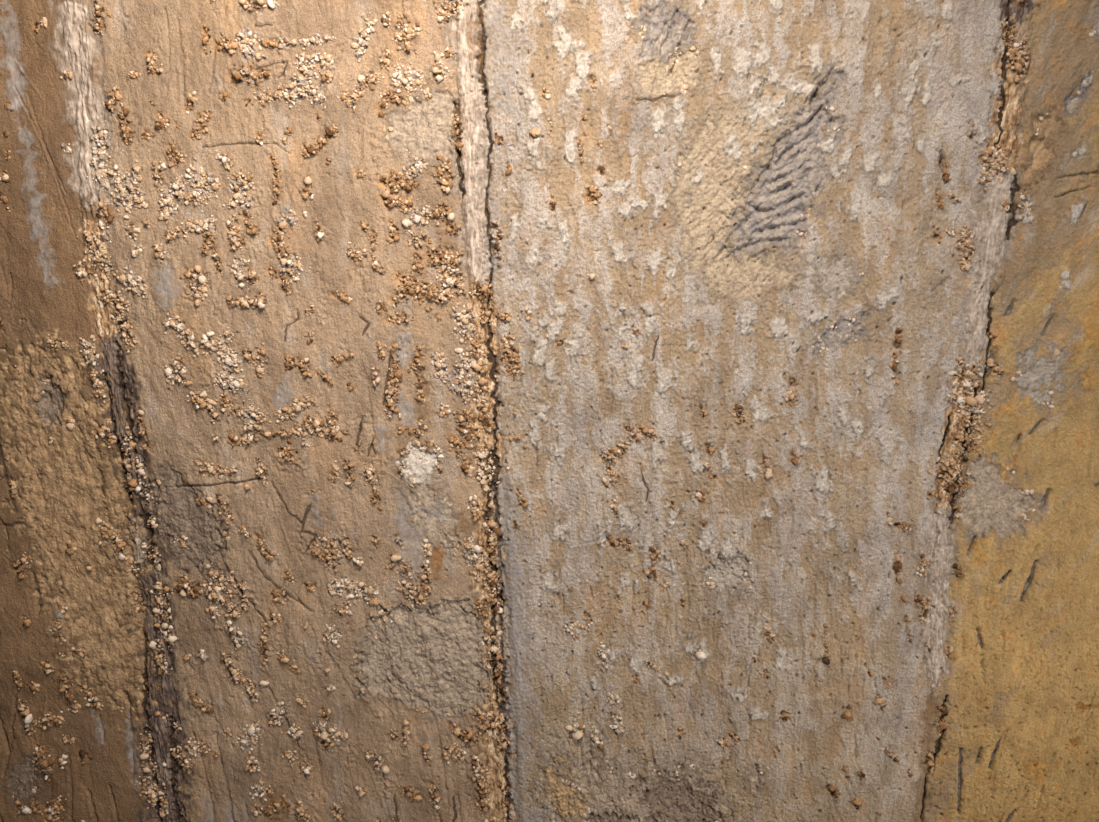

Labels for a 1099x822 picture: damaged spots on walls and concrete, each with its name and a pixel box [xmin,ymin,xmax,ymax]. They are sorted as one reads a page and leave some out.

leakage [34,17,47,33]
leakage [0,132,11,212]
crack [1055,171,1099,223]
crack [359,316,370,336]
crack [49,0,321,822]
crack [431,0,532,822]
crack [914,0,1041,819]
leakage [565,692,624,750]